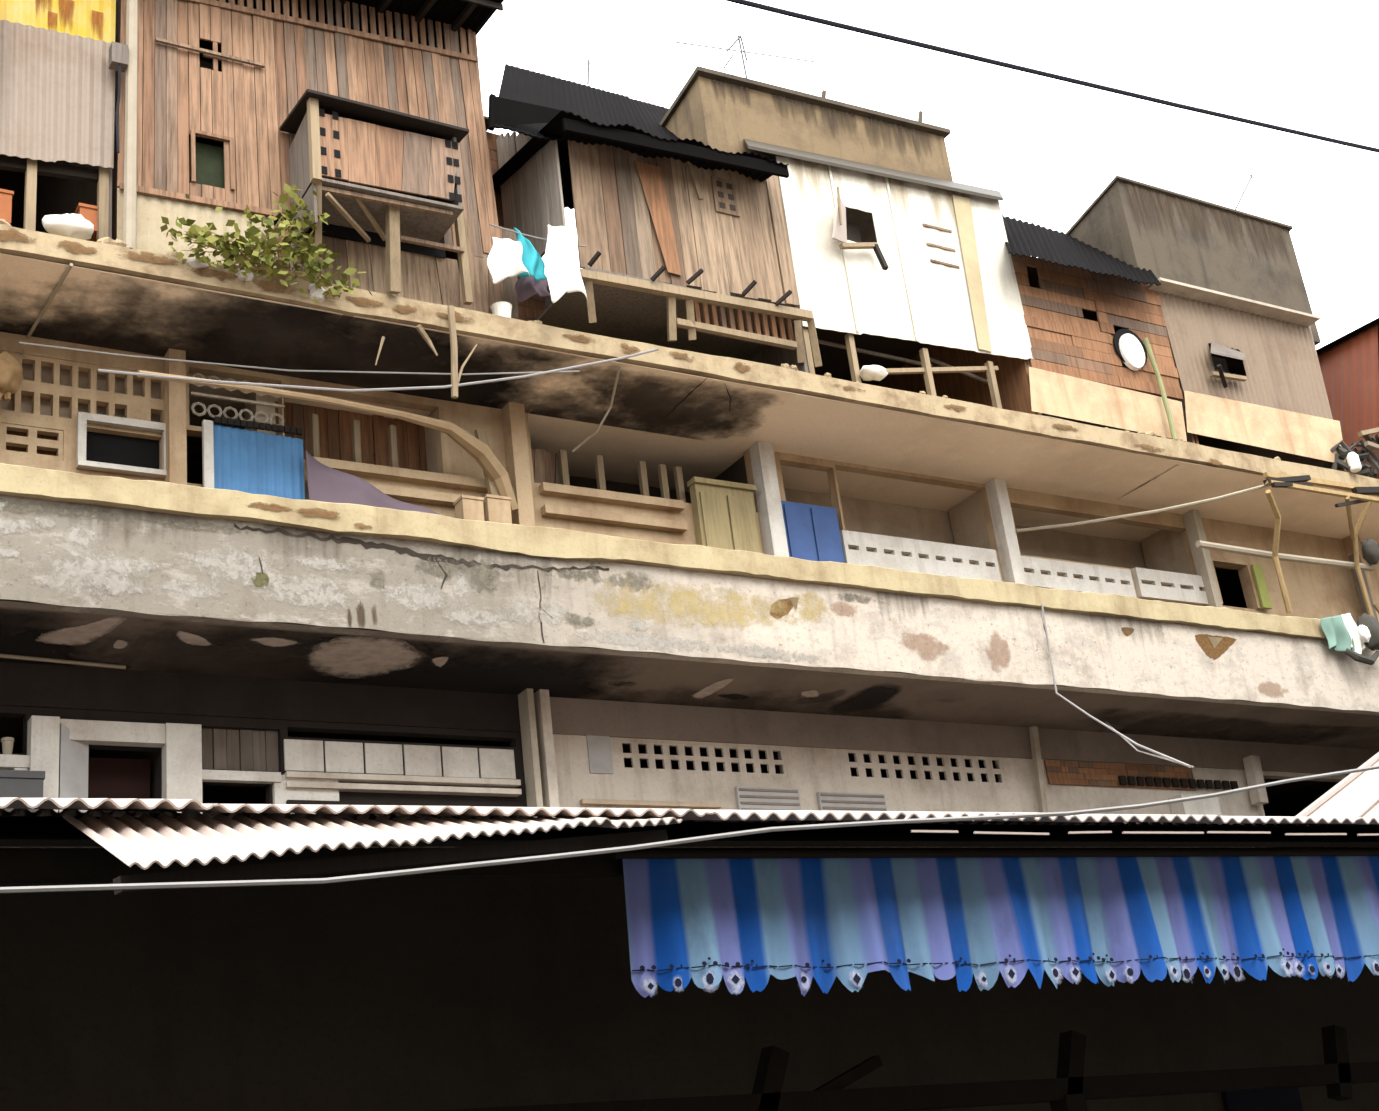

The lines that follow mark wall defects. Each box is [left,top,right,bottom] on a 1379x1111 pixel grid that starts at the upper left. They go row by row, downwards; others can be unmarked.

leakage [1126,183,1287,250]
leakage [525,375,768,439]
crack [234,523,610,643]
spalling [770,597,799,619]
spalling [1195,634,1237,659]